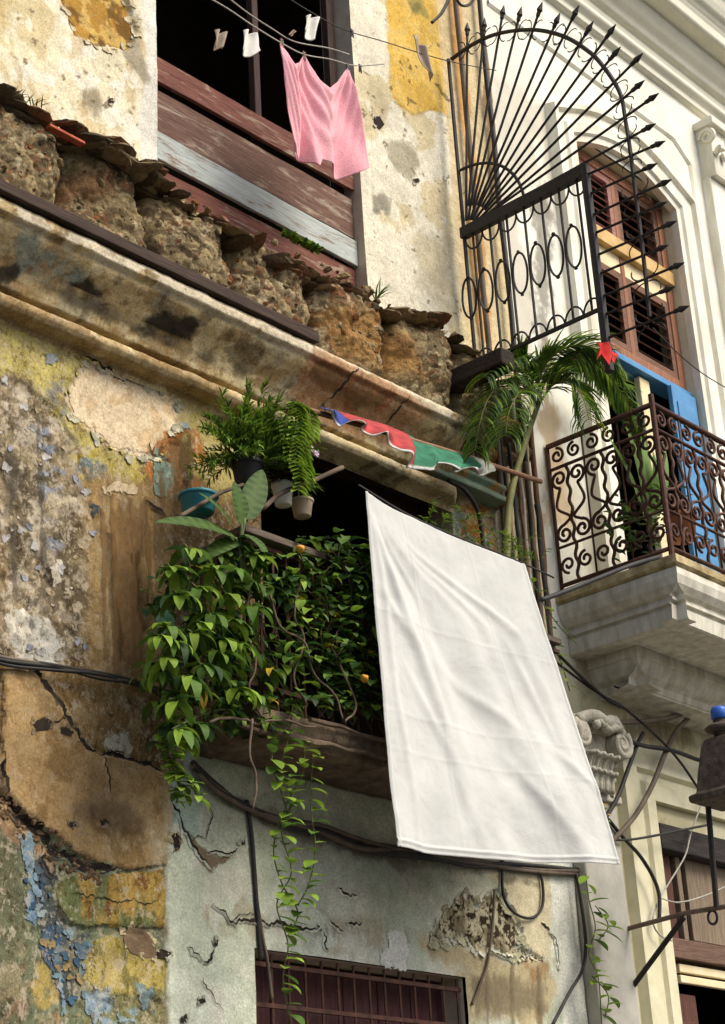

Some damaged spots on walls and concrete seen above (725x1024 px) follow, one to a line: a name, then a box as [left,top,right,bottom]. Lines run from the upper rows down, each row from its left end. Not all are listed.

flaking render [61,0,143,54]
spalling [0,104,490,452]
crack [327,368,359,401]
flaking render [0,360,191,664]
crack [0,757,160,905]
crack [24,669,240,873]
peeling [17,832,155,1024]
peeling [119,921,174,962]
crack [211,888,363,952]
flaking render [428,886,543,964]